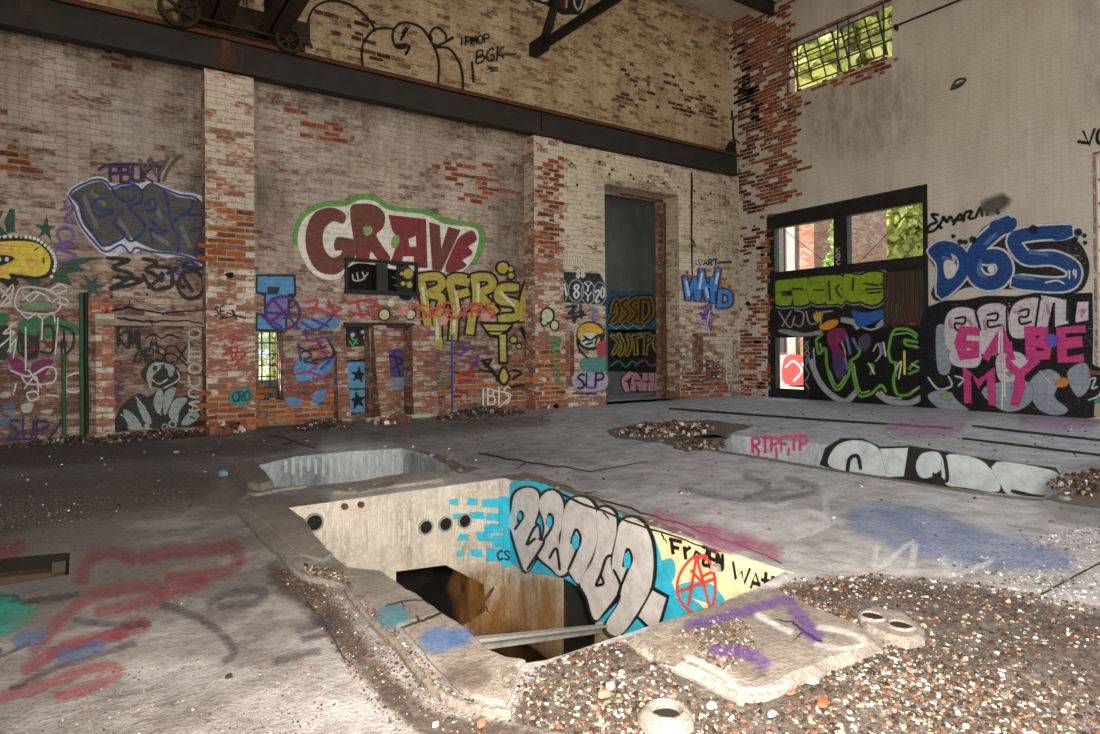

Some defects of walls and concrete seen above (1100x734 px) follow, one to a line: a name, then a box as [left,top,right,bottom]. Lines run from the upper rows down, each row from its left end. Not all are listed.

peeling [284,107,355,144]
peeling [612,62,719,128]
peeling [0,144,44,174]
peeling [432,156,578,258]
peeling [679,0,898,399]
crack [1036,562,1100,597]